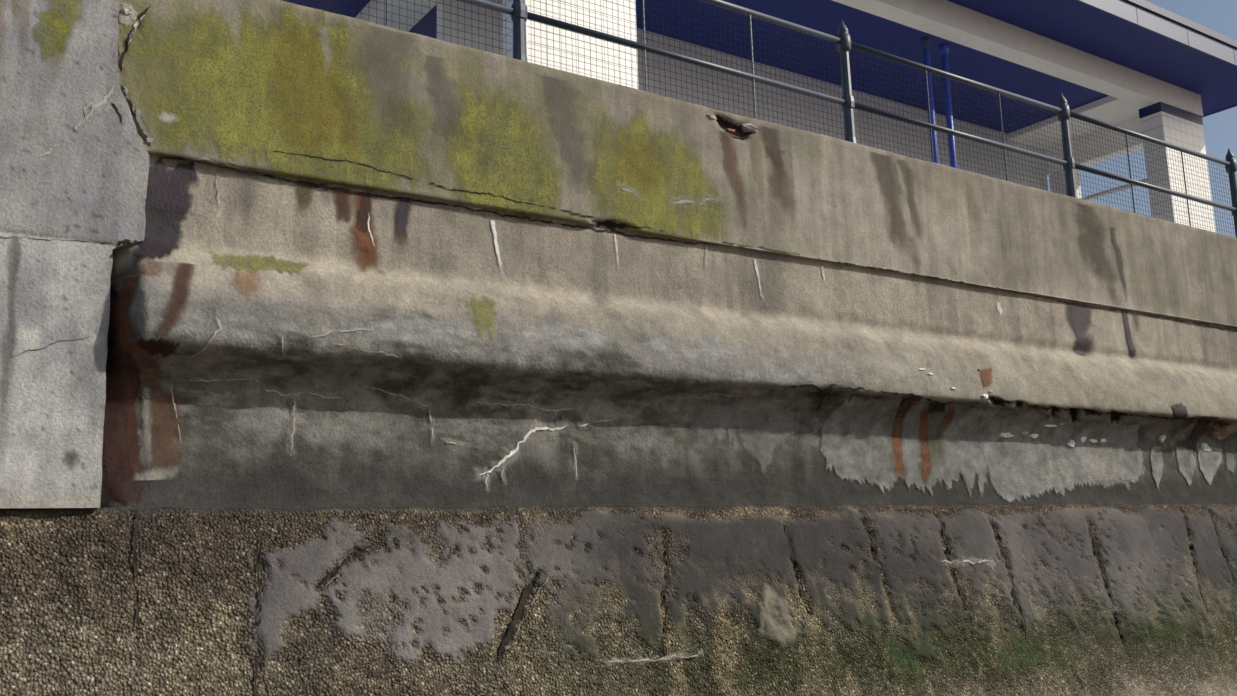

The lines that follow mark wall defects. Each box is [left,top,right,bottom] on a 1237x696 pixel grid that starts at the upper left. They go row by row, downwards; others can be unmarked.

spalling [707,115,759,140]
water stain [133,158,198,264]
corrosion [337,187,377,270]
corrosion [102,263,193,506]
crack [189,316,340,450]
crack [282,328,398,358]
water stain [1066,302,1093,356]
water stain [1123,310,1138,357]
crack [475,402,617,489]
corrosion [892,395,955,483]
peeling [821,387,1237,502]
spalling [321,537,379,587]